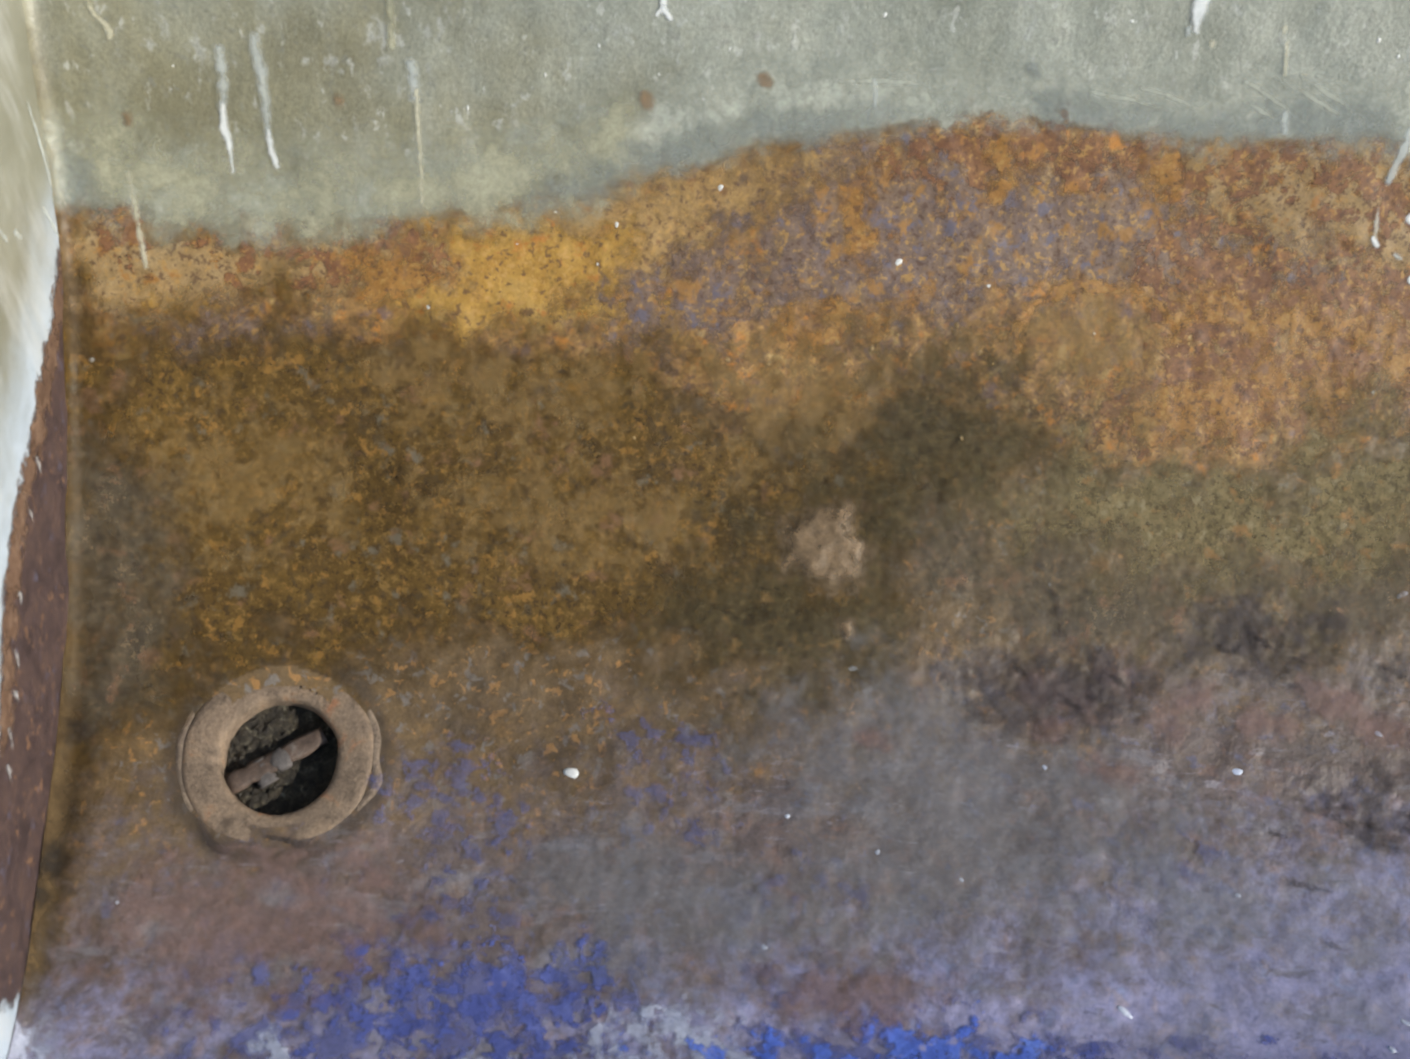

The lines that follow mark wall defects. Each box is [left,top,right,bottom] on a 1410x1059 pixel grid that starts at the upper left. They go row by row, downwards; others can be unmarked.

leakage [89,6,113,39]
leakage [30,35,968,264]
leakage [1229,26,1410,183]
corrosion [64,107,1410,720]
corrosion [0,249,105,1008]
peeling [165,925,1125,1059]